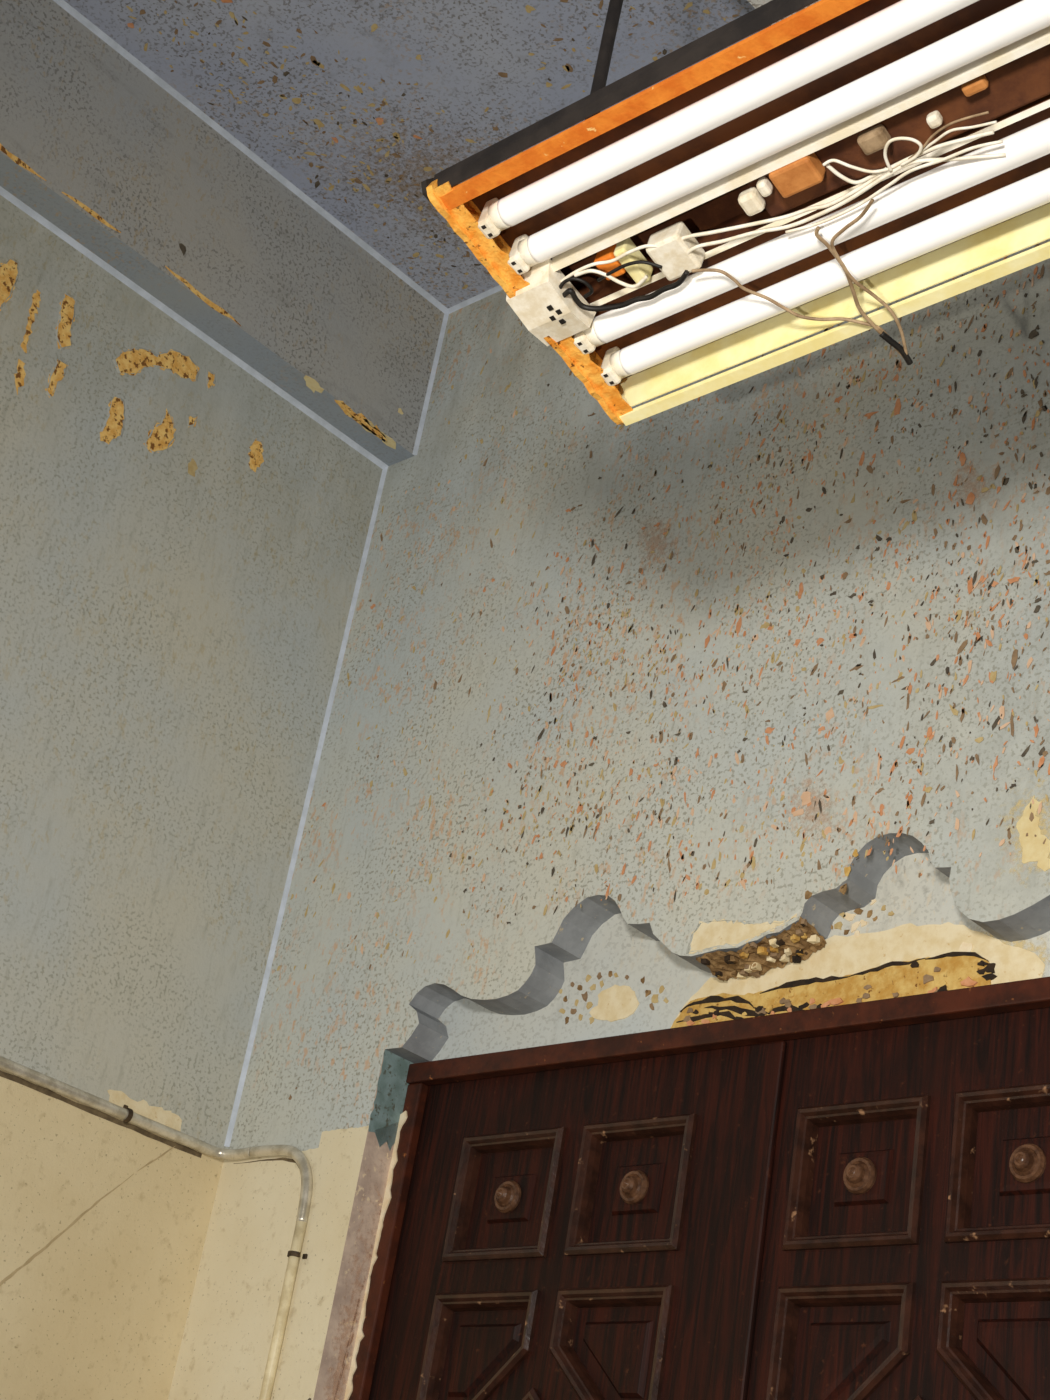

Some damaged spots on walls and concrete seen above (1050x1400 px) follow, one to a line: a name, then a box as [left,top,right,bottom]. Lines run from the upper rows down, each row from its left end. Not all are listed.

peeling [0,257,19,311]
peeling [14,290,41,395]
peeling [45,292,75,400]
peeling [112,347,216,391]
peeling [98,396,126,446]
peeling [143,408,198,454]
peeling [248,438,264,472]
peeling [304,375,396,450]
flaking render [342,264,1050,1028]
peeling [291,858,416,969]